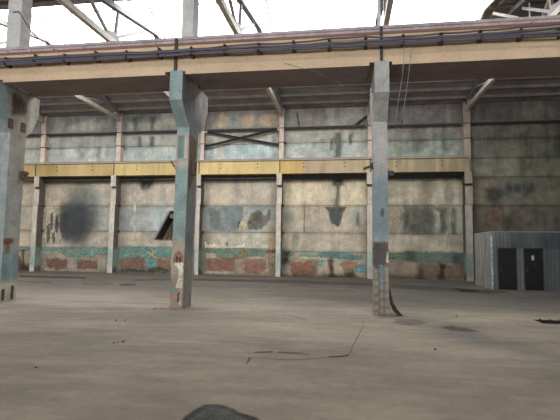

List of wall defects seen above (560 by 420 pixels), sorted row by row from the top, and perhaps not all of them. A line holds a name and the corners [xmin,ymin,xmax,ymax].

peeling [210,206,247,231]
leakage [325,179,346,226]
peeling [118,246,183,307]
crack [247,351,350,362]